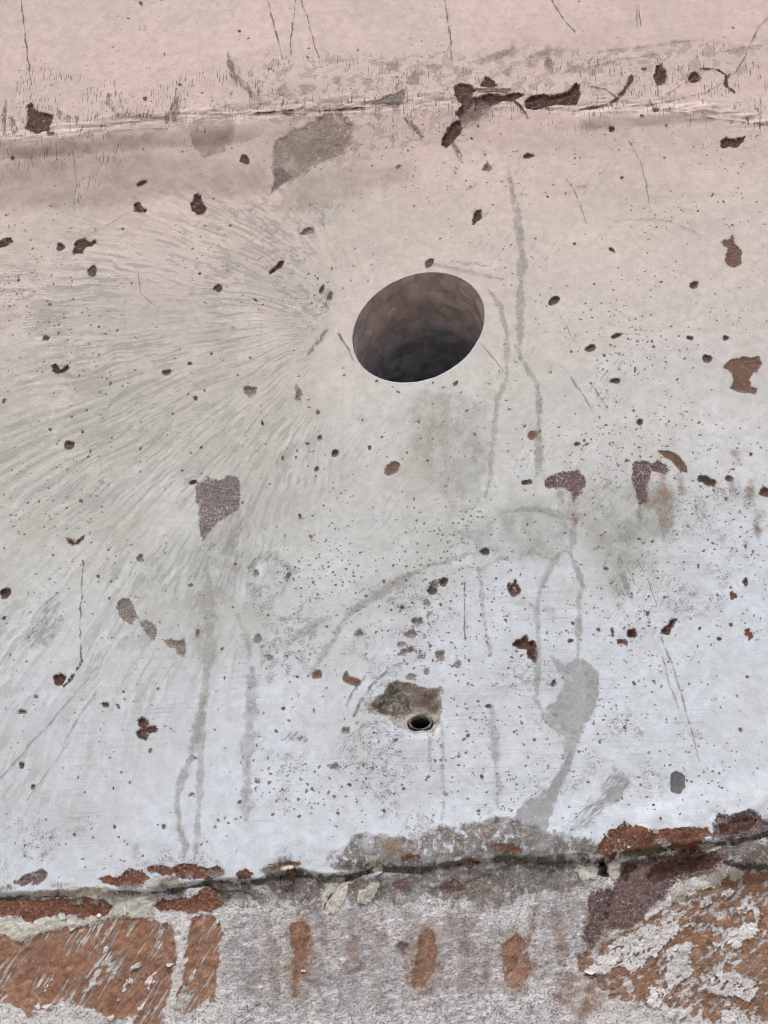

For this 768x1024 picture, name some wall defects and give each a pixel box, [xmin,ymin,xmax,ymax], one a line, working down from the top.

spalling [24,102,54,136]
spalling [441,69,581,148]
spalling [702,354,762,394]
spalling [188,475,241,540]
spalling [521,470,586,503]
spalling [624,450,734,508]
peeling [0,659,768,1024]
crack [569,833,768,872]
crack [0,854,544,907]